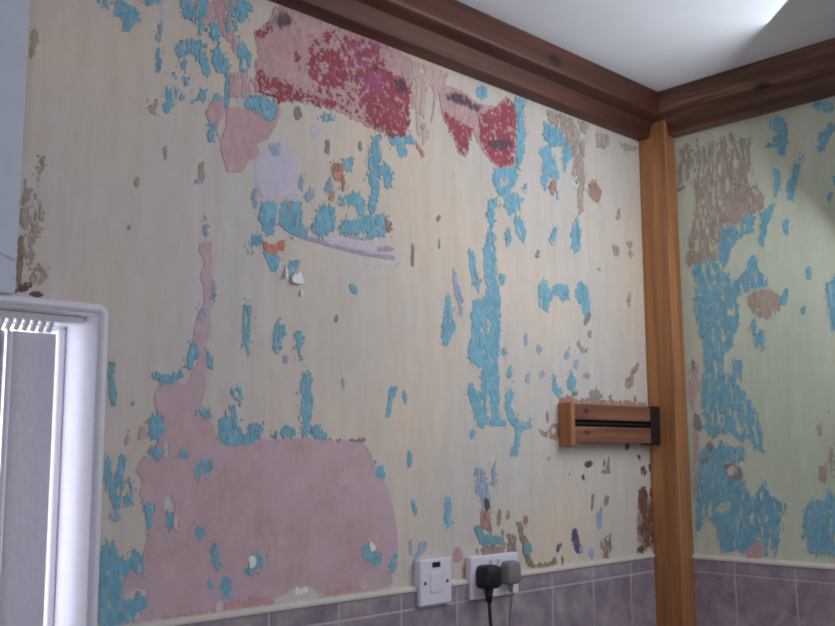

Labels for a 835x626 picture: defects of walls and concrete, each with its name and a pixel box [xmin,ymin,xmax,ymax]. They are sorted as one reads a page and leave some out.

peeling [244,132,425,297]
peeling [538,109,639,255]
flaking render [97,216,398,626]
peeling [385,386,408,418]
peeling [441,95,559,457]
peeling [538,277,592,338]
peeling [540,340,590,403]
peeling [676,132,805,559]
peeling [825,276,835,330]
peeling [473,460,498,512]
peeling [516,494,613,568]
peeling [801,440,835,560]